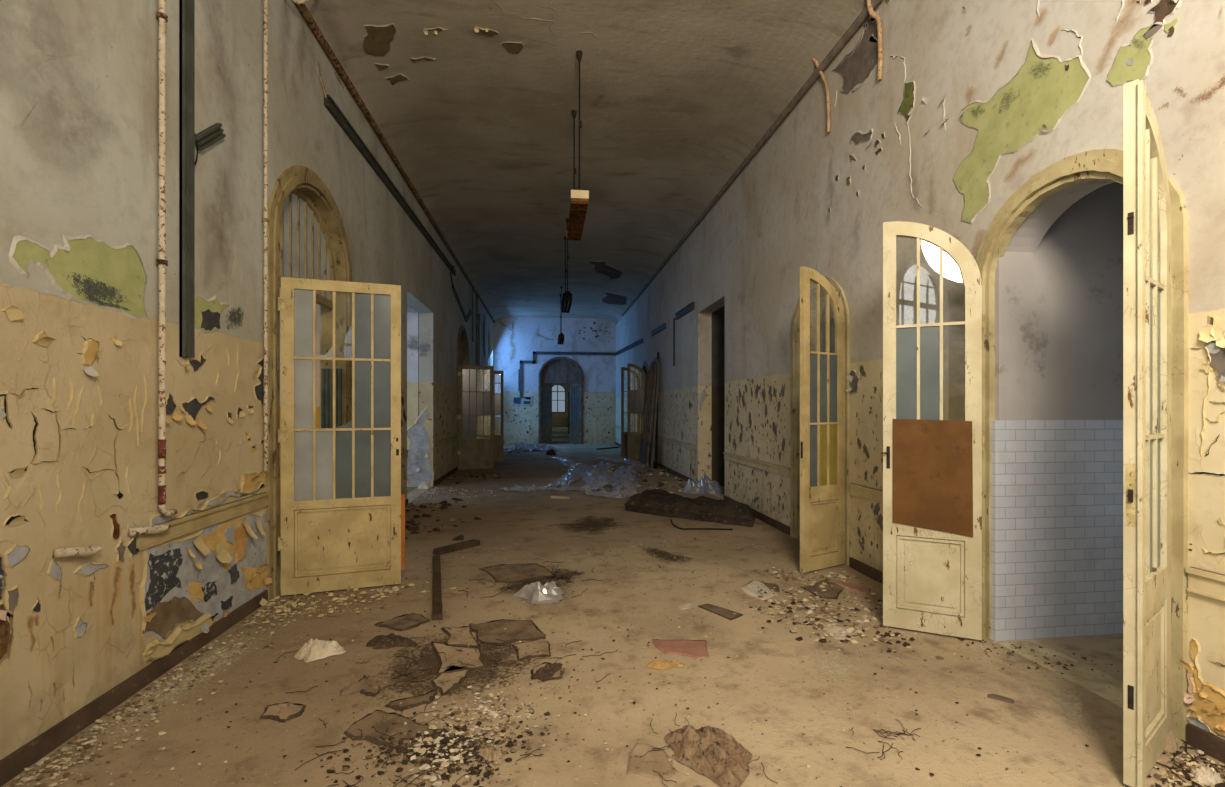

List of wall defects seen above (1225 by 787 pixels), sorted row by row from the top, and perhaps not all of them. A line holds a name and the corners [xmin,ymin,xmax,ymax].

peeling [832,0,891,96]
peeling [1106,0,1182,87]
peeling [952,39,1091,224]
peeling [9,234,149,320]
crack [0,336,147,522]
peeling [166,356,269,429]
crack [1188,323,1225,476]
peeling [1199,314,1225,386]
spalling [0,543,41,665]
spalling [47,489,277,662]
crack [1188,519,1225,554]
peeling [1178,638,1225,740]